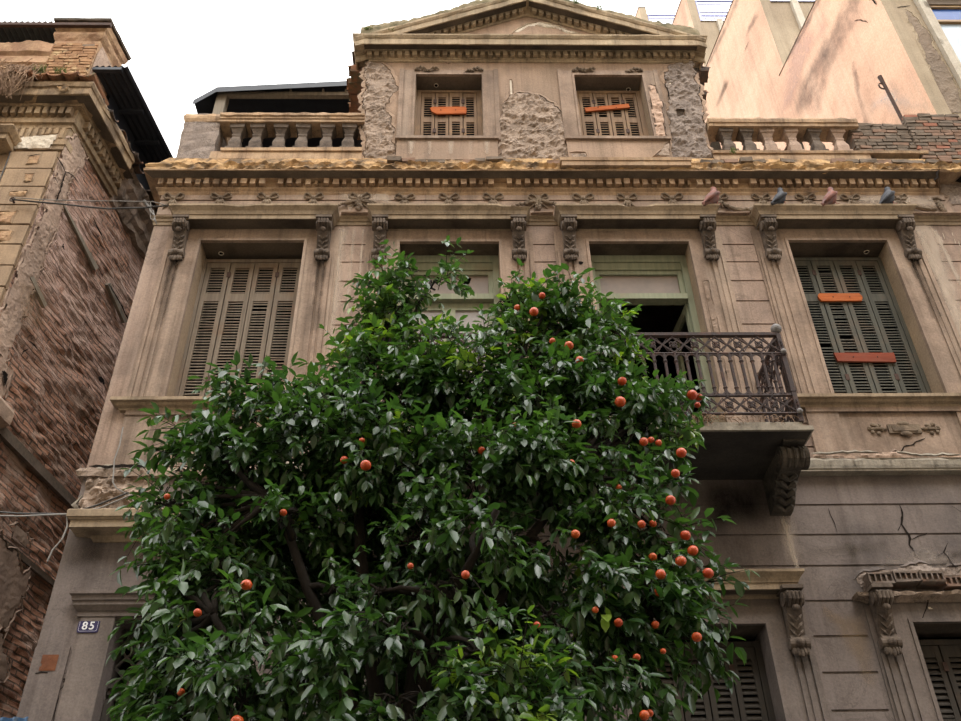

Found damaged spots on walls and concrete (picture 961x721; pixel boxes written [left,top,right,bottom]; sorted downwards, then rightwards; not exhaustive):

flaking render [357,61,399,159]
flaking render [498,79,588,160]
flaking render [648,61,713,159]
flaking render [0,133,89,400]
flaking render [71,464,161,509]
crack [898,505,958,569]
peeling [0,522,34,684]